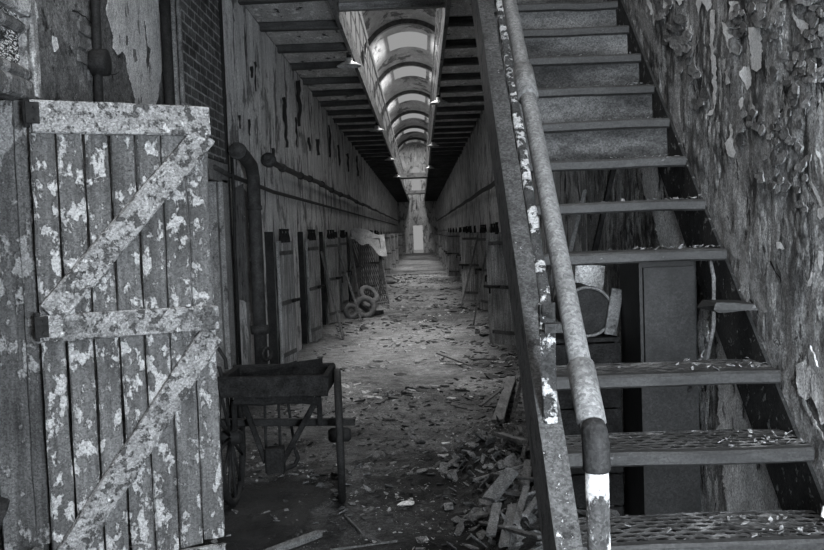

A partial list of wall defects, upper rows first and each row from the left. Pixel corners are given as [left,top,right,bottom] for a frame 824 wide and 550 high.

peeling [646,0,824,220]
peeling [639,167,669,200]
peeling [652,211,687,249]
peeling [807,251,824,287]
spalling [808,398,824,432]